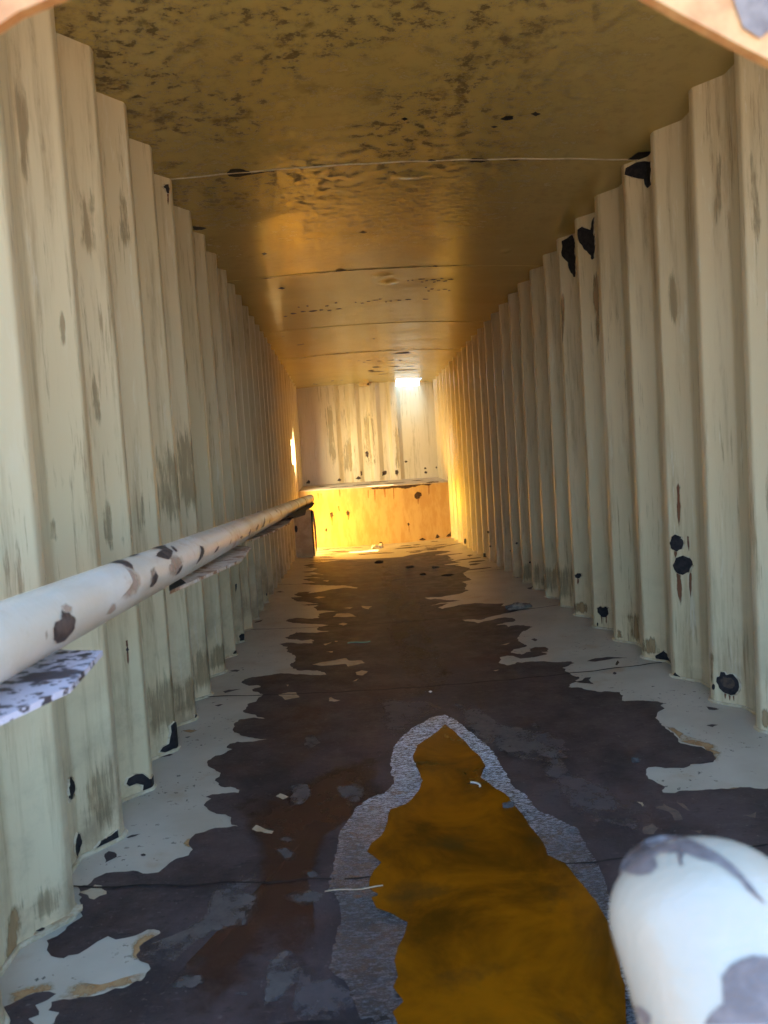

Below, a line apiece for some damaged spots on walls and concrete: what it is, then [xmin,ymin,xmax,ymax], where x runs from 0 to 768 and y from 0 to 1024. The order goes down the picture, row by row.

peeling [624,160,652,189]
peeling [561,218,596,278]
rust [669,484,689,558]
peeling [4,541,768,1024]